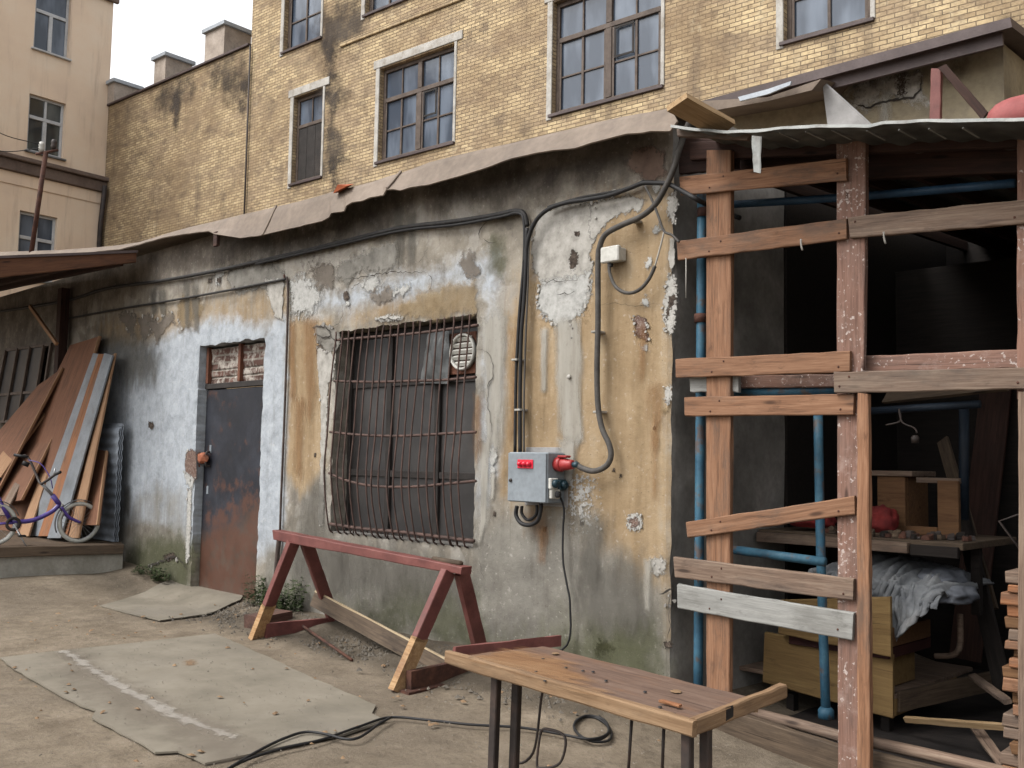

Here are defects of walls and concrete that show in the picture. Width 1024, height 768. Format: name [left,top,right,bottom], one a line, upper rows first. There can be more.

spalling [459,248,481,279]
spalling [531,146,679,351]
spalling [183,448,209,564]
peeling [561,469,602,534]
spalling [626,513,643,532]